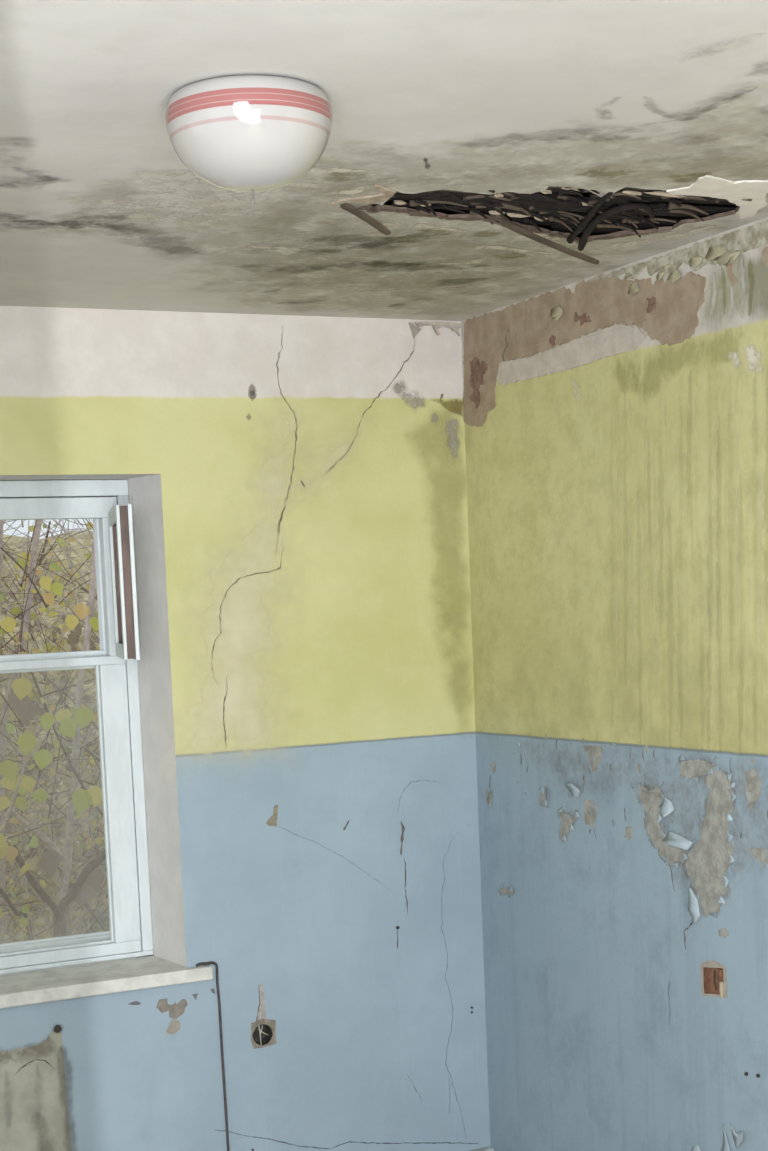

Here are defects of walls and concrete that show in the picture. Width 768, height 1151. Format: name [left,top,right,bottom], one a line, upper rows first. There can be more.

leakage [86,168,375,232]
leakage [420,233,593,266]
flaking render [408,175,768,456]
leakage [712,259,768,322]
crack [328,338,415,472]
peeling [395,383,424,408]
leakage [440,400,463,415]
crack [211,326,297,751]
peeling [517,734,616,842]
peeling [612,745,768,949]
peeling [156,989,215,1035]
crack [217,830,477,1149]